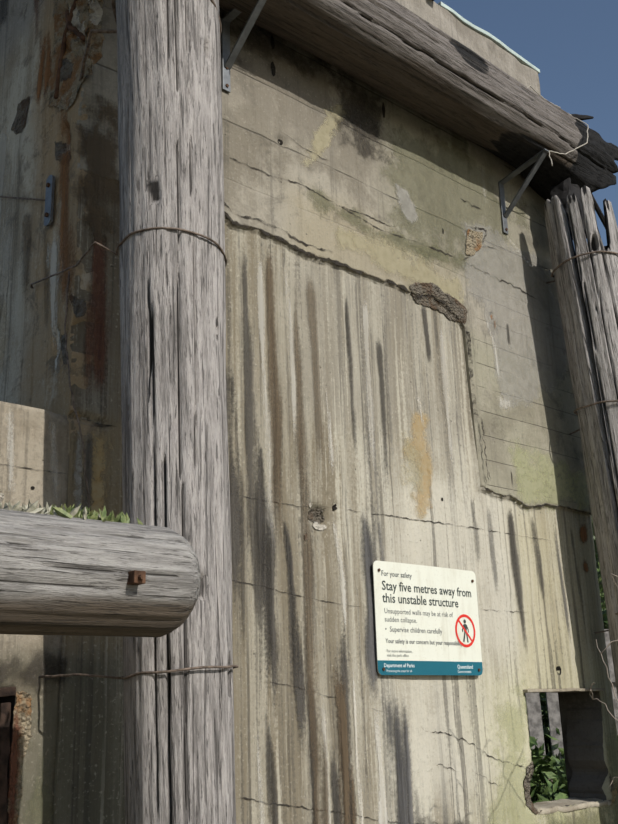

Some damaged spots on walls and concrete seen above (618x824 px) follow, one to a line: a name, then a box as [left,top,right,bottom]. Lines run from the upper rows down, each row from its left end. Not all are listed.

spalling [11,97,30,134]
rust [37,36,52,99]
spalling [47,0,105,111]
rust [59,110,75,304]
crack [231,158,536,299]
rust [85,237,108,384]
crack [224,202,592,539]
damp [226,257,364,824]
damp [361,518,378,689]
spalling [7,691,32,824]
damp [375,704,414,824]
crack [432,726,527,770]